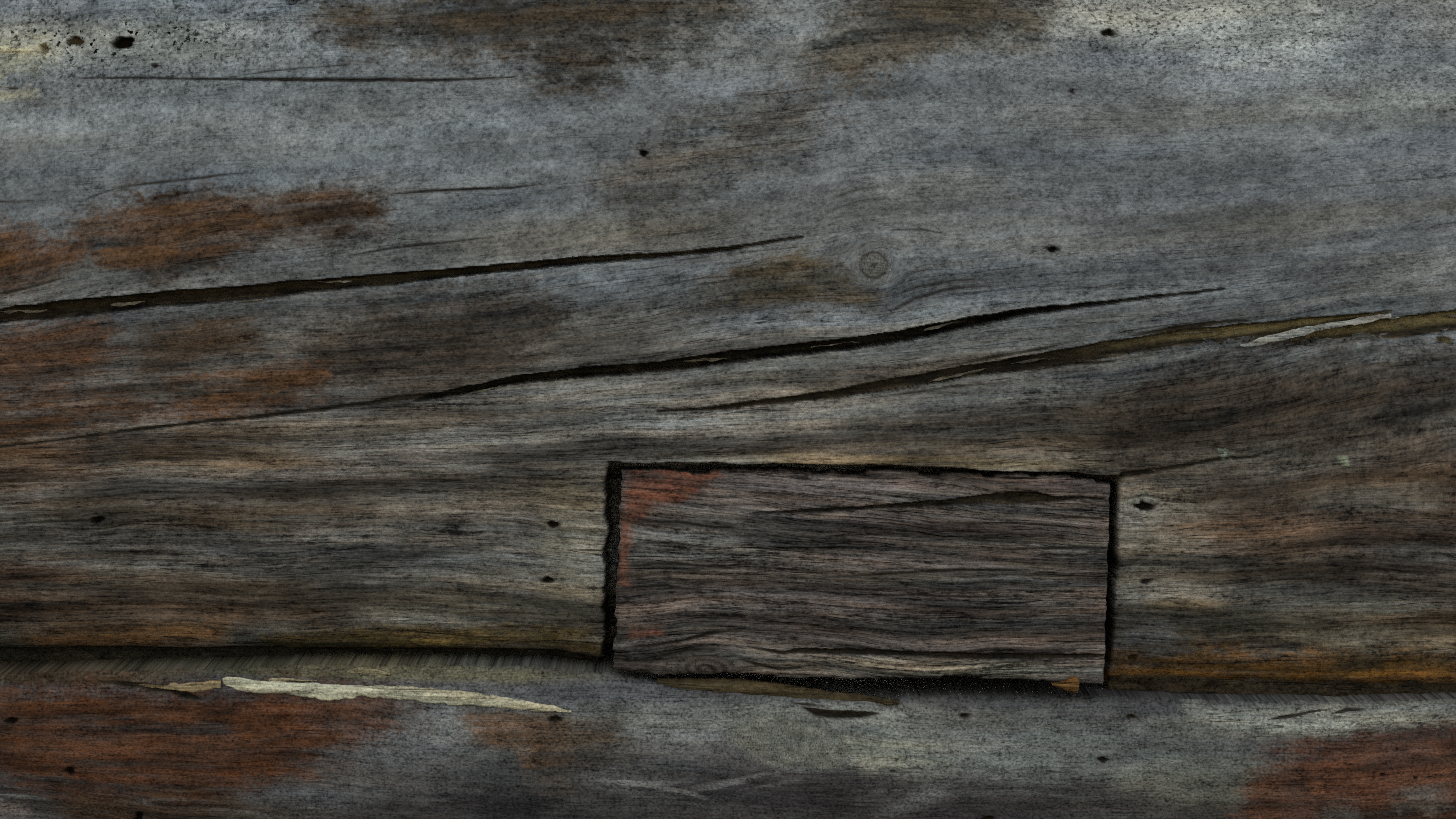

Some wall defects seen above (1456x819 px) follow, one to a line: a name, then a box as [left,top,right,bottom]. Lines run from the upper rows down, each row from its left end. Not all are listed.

crack [76,171,246,202]
rust [0,156,408,461]
crack [0,182,1456,448]
rust [1214,721,1456,819]